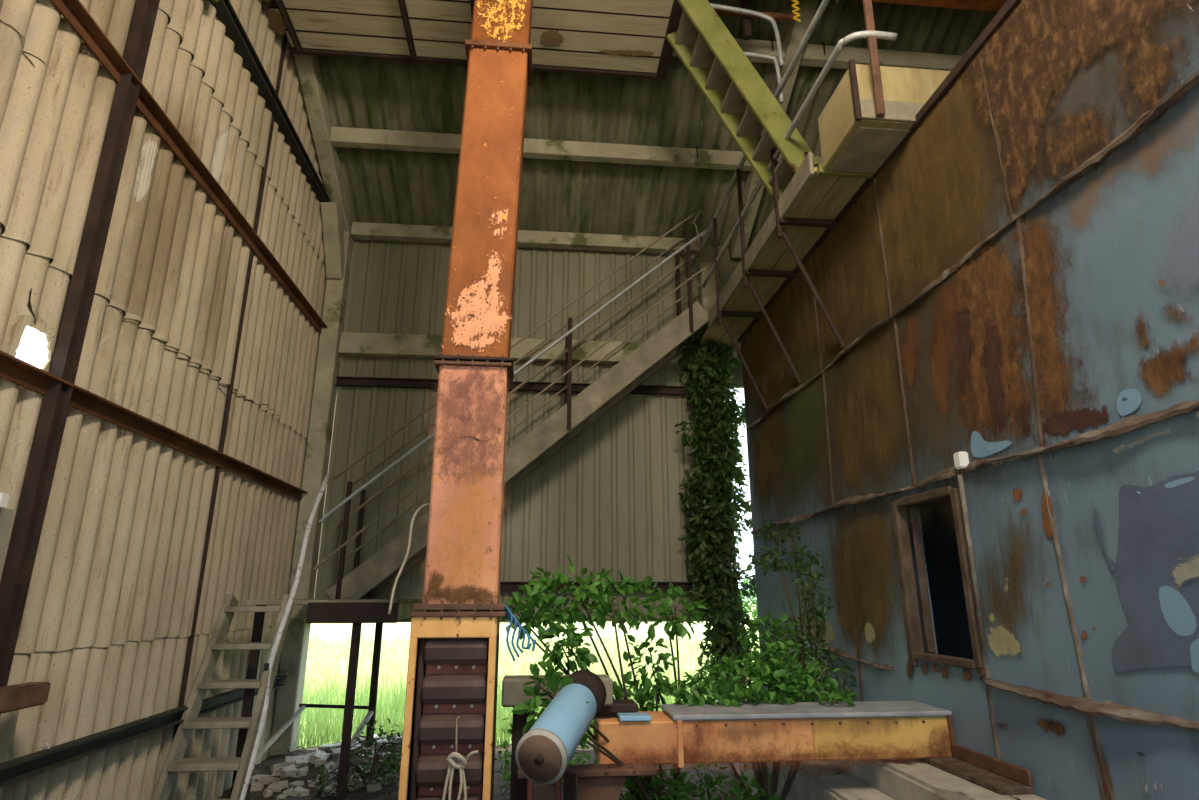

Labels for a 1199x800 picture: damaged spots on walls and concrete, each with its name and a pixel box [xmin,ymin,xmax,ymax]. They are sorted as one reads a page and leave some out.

peeling [442,206,512,354]
corrosion [432,369,505,483]
corrosion [422,573,496,604]